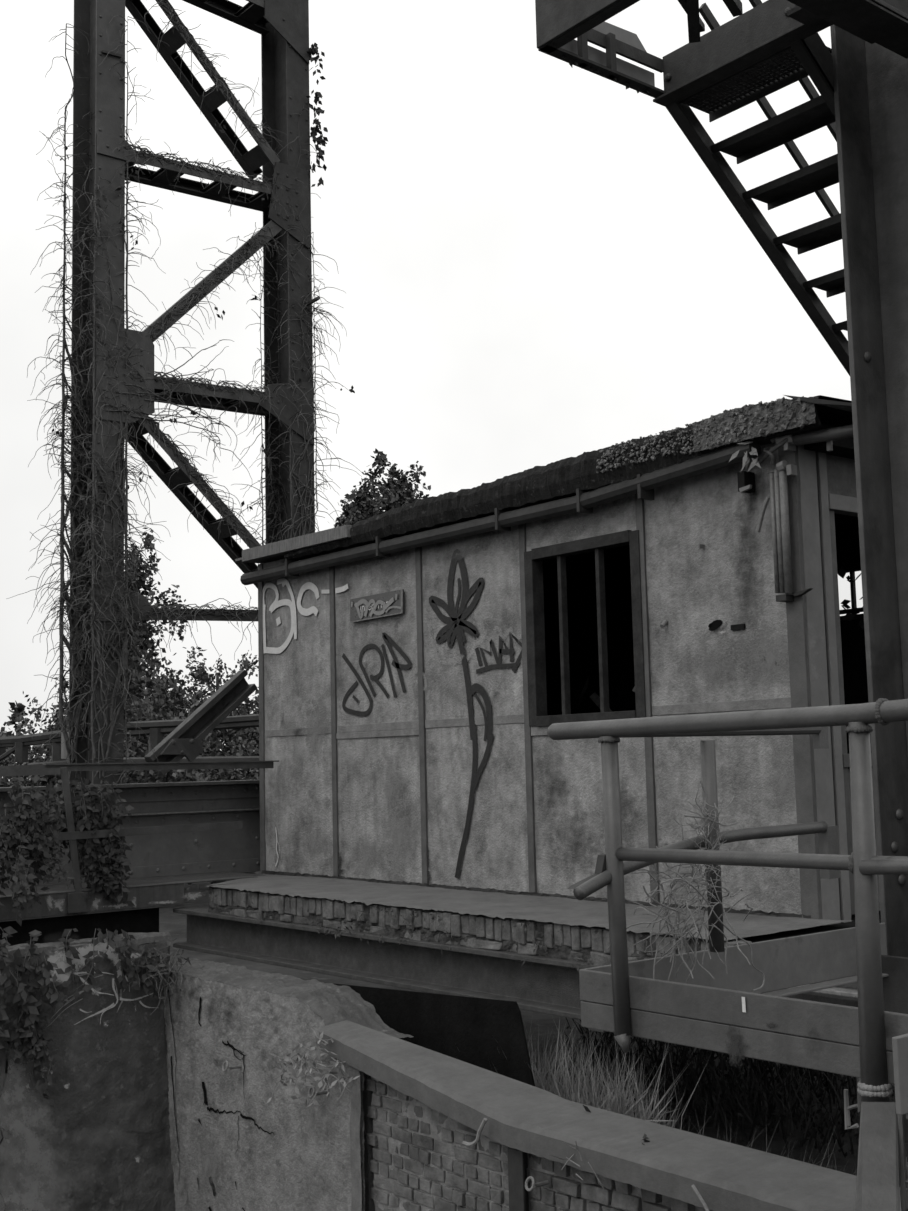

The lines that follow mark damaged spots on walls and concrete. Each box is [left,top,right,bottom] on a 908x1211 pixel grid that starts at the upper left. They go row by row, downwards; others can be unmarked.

leakage [1,1047,67,1211]